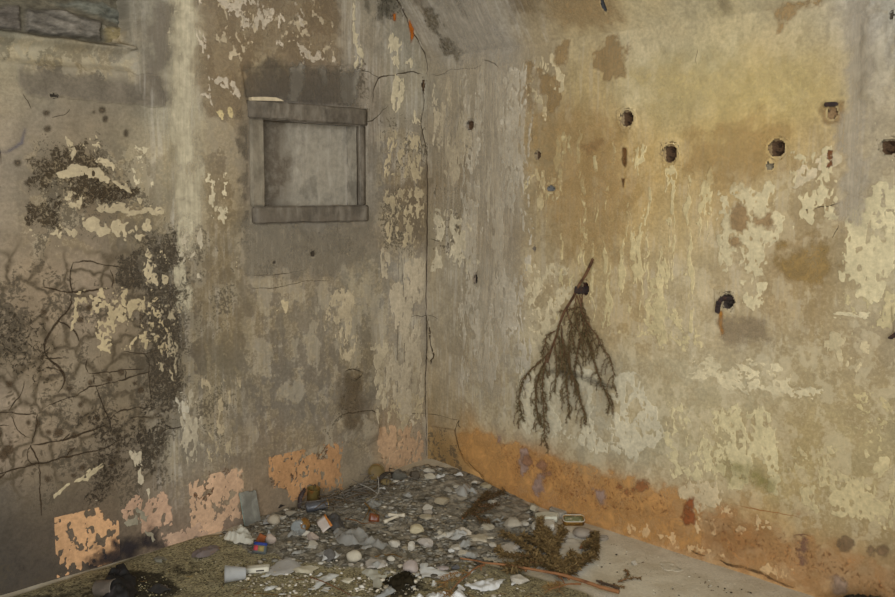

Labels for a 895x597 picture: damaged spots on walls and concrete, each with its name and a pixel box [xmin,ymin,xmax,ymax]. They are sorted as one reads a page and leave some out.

peeling [196,0,336,120]
peeling [352,3,364,69]
peeling [29,135,182,381]
peeling [177,228,203,262]
crack [360,0,499,478]
peeling [370,33,895,560]
peeling [53,374,244,578]
peeling [269,441,343,502]
water stain [519,448,551,496]
peeling [759,563,794,585]
water stain [837,536,854,551]